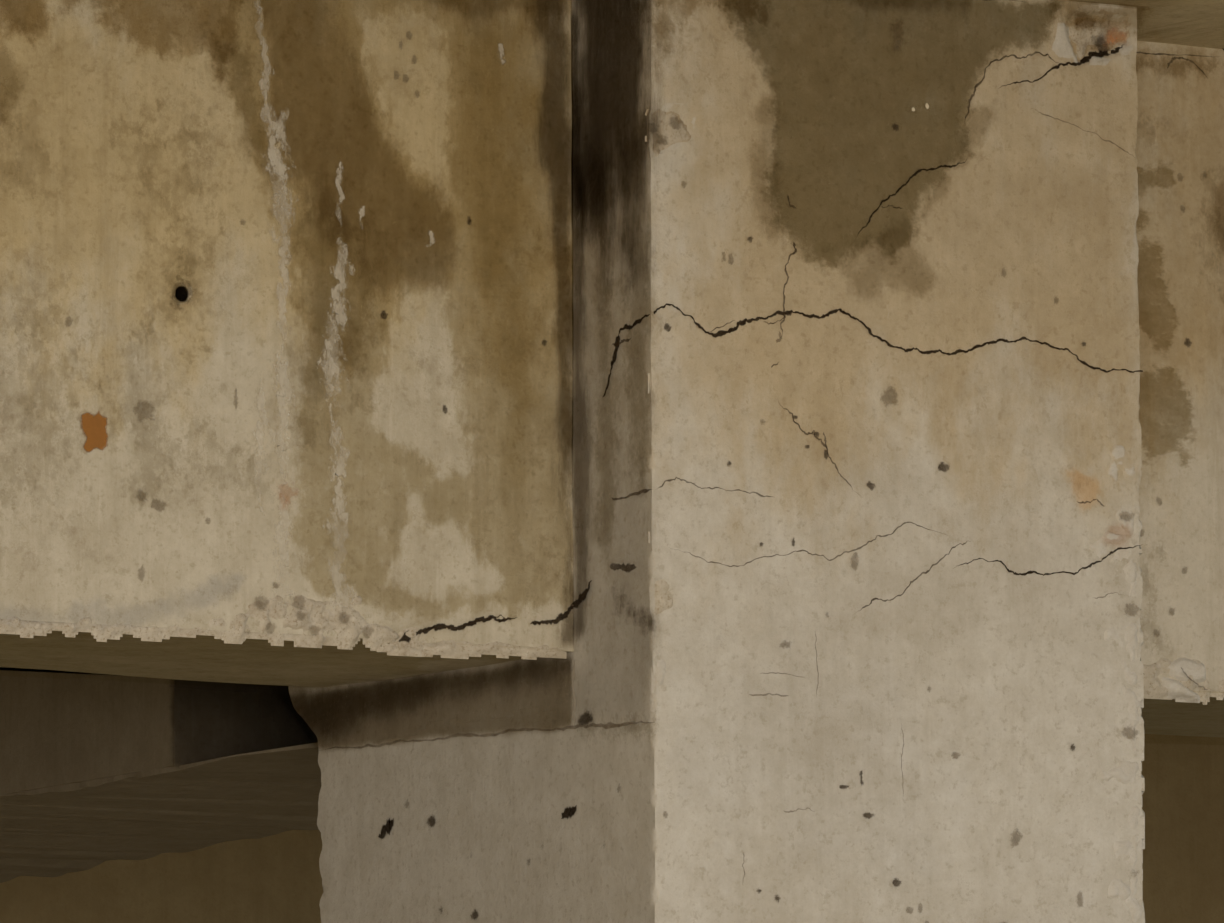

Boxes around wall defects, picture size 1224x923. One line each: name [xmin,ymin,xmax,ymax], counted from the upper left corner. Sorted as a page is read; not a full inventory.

damp [261,52,287,180]
crack [965,44,1224,118]
crack [858,158,968,234]
damp [317,251,348,390]
crack [603,243,1143,397]
corrosion [81,411,108,452]
crack [785,408,851,486]
crack [678,522,1141,610]
crack [399,580,592,643]